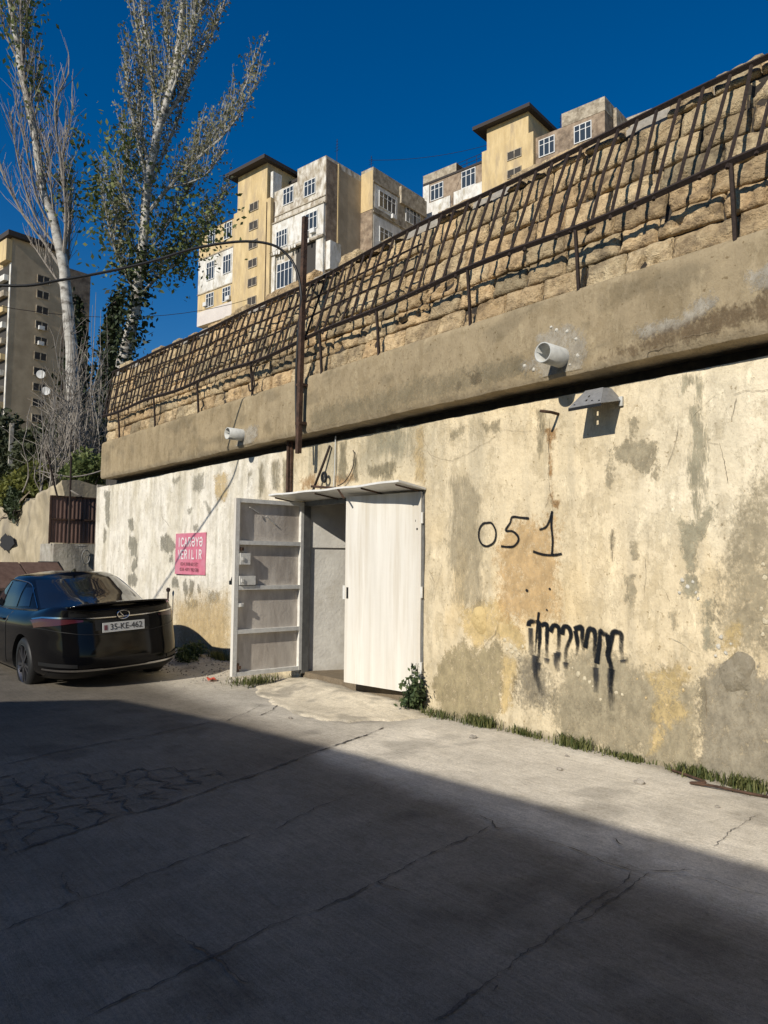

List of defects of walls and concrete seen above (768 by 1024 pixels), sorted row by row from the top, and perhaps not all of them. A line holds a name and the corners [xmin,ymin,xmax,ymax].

crack [5,727,384,856]
crack [82,817,498,1020]
crack [428,828,760,1022]